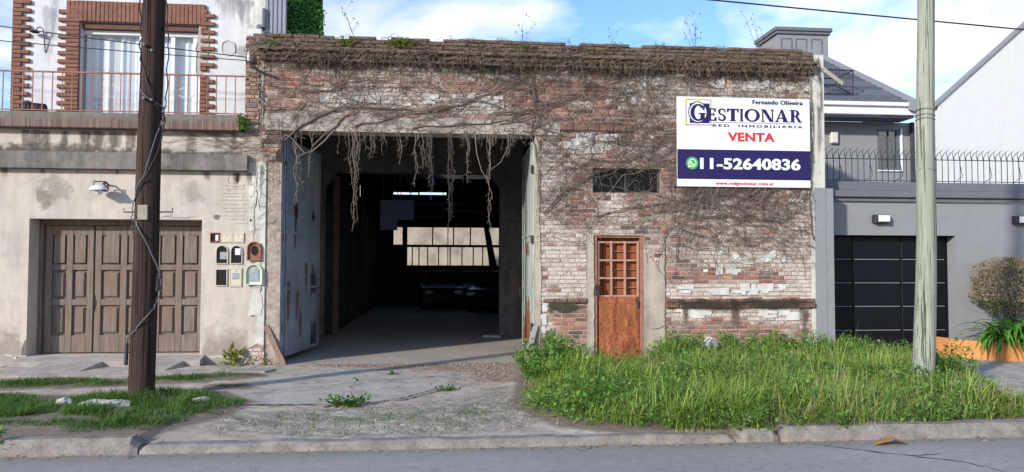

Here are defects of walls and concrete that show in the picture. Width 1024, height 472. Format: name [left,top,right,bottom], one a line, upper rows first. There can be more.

peeling [563,133,618,153]
peeling [703,247,786,295]
corrosion [287,262,316,344]
peeling [541,298,550,333]
peeling [676,308,712,318]
peeling [730,308,811,320]